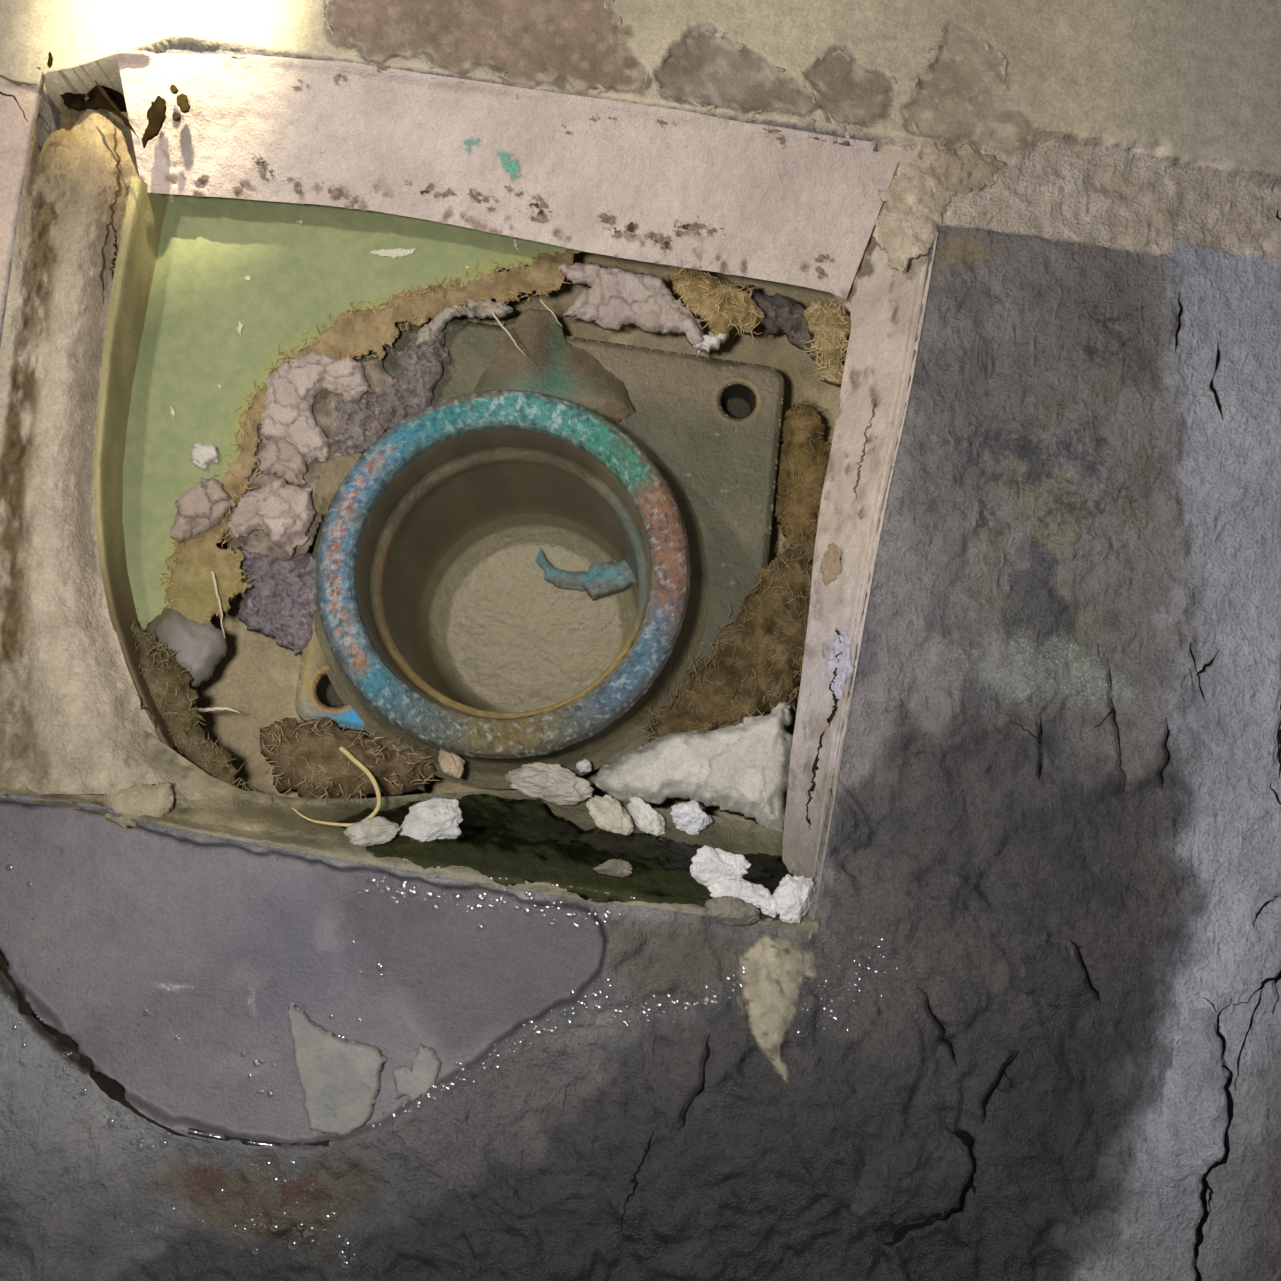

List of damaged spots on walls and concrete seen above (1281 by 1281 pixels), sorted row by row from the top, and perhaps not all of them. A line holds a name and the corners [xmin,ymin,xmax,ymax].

spalling [322,0,1033,153]
spalling [453,213,851,443]
crack [1209,341,1223,419]
spalling [190,593,304,798]
spalling [579,769,607,797]
crack [806,628,843,830]
crack [1270,704,1281,805]
water stain [140,981,195,992]
spalling [0,802,606,1144]
water stain [448,793,1146,1281]
crack [883,1051,1019,1245]
crack [1194,971,1281,1281]